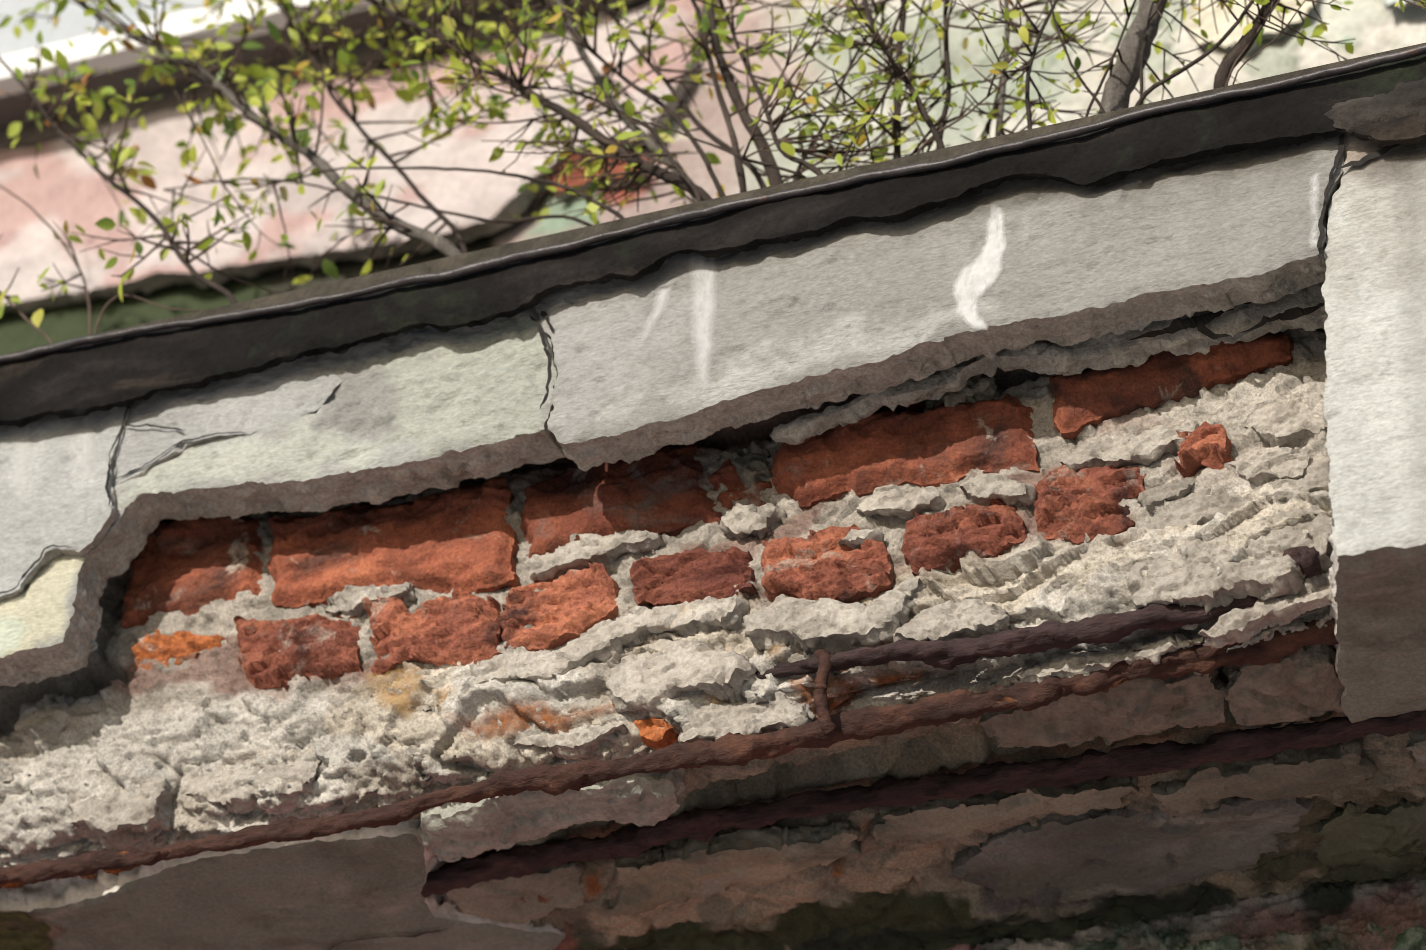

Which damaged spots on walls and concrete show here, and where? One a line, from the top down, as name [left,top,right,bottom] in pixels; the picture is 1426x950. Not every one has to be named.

crack [1317,135,1400,267]
efflorescence [955,208,1005,328]
crack [530,311,553,409]
crack [1129,302,1325,342]
spalling [0,282,1426,950]
corrosion [472,705,577,734]
corrosion [797,675,918,716]